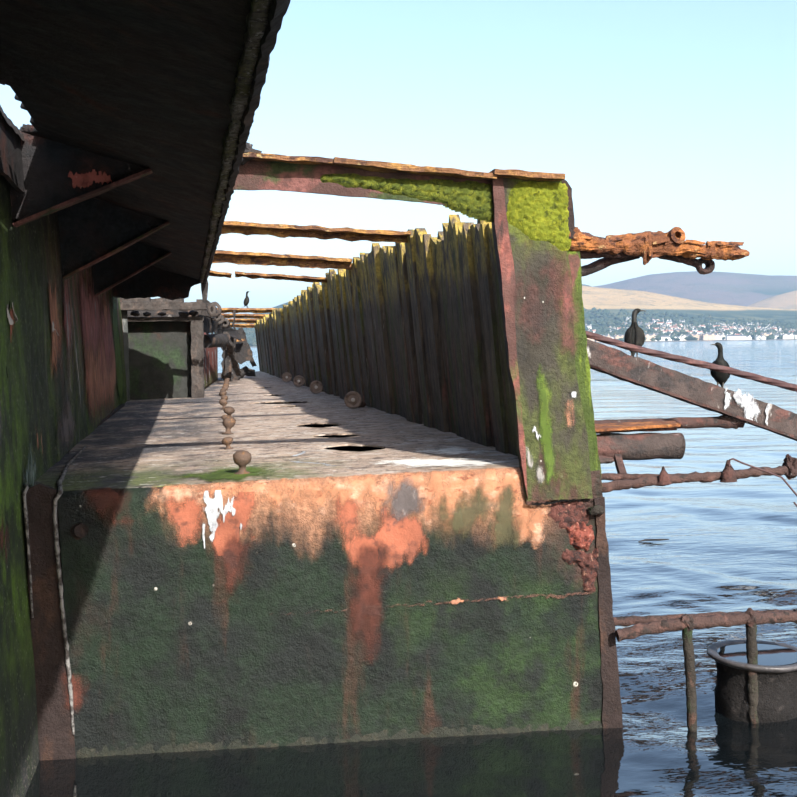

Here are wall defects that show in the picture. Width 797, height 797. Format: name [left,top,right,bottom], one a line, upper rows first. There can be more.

peeling [6,302,18,337]
corrosion [49,275,117,422]
corrosion [154,469,546,646]
crack [325,591,595,613]